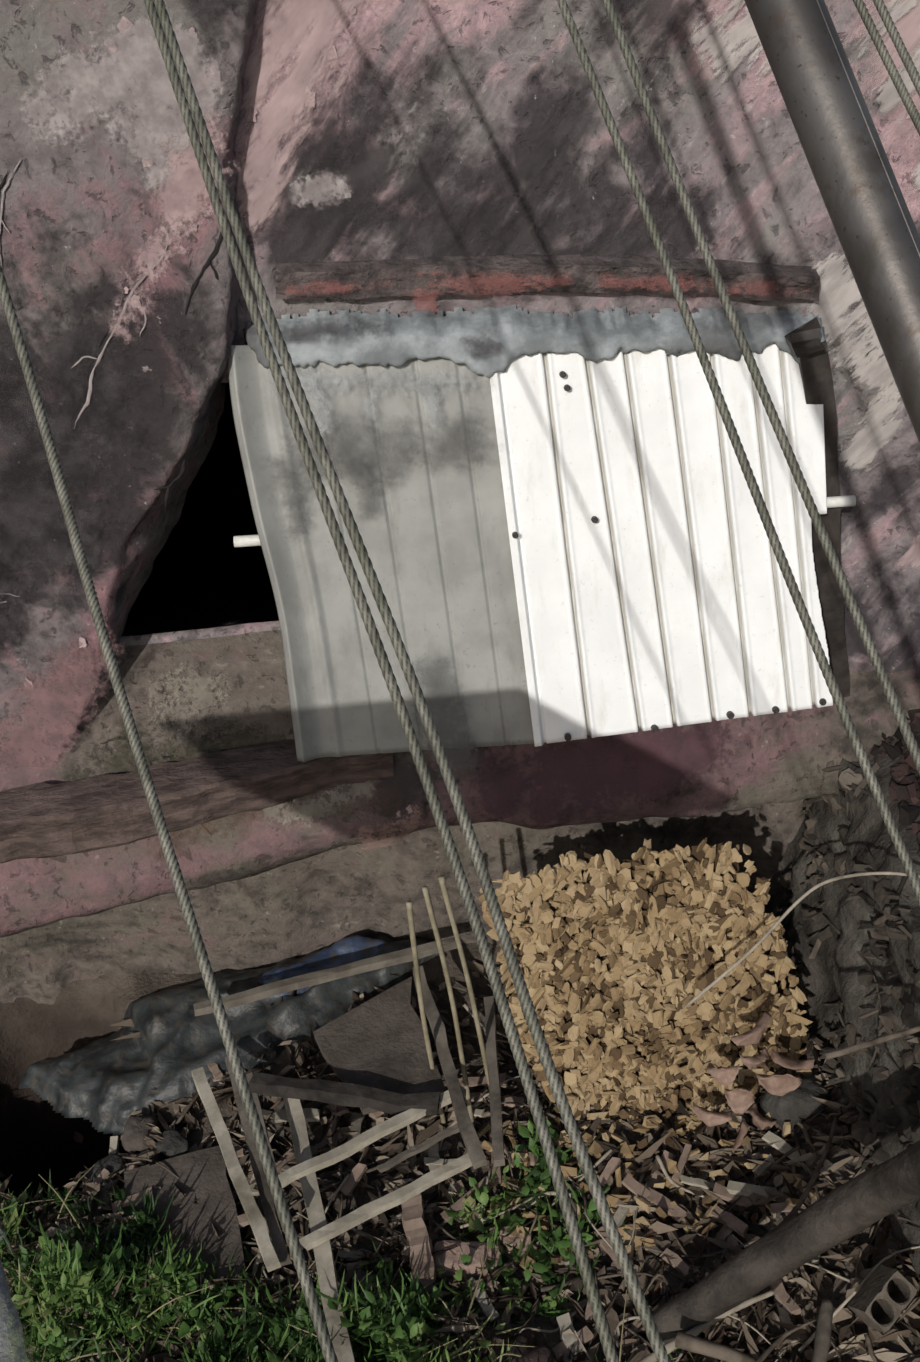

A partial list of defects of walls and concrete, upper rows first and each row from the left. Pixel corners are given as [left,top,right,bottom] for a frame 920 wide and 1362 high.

leakage [373,109,412,144]
leakage [291,174,351,207]
crack [185,232,223,315]
crack [69,218,181,428]